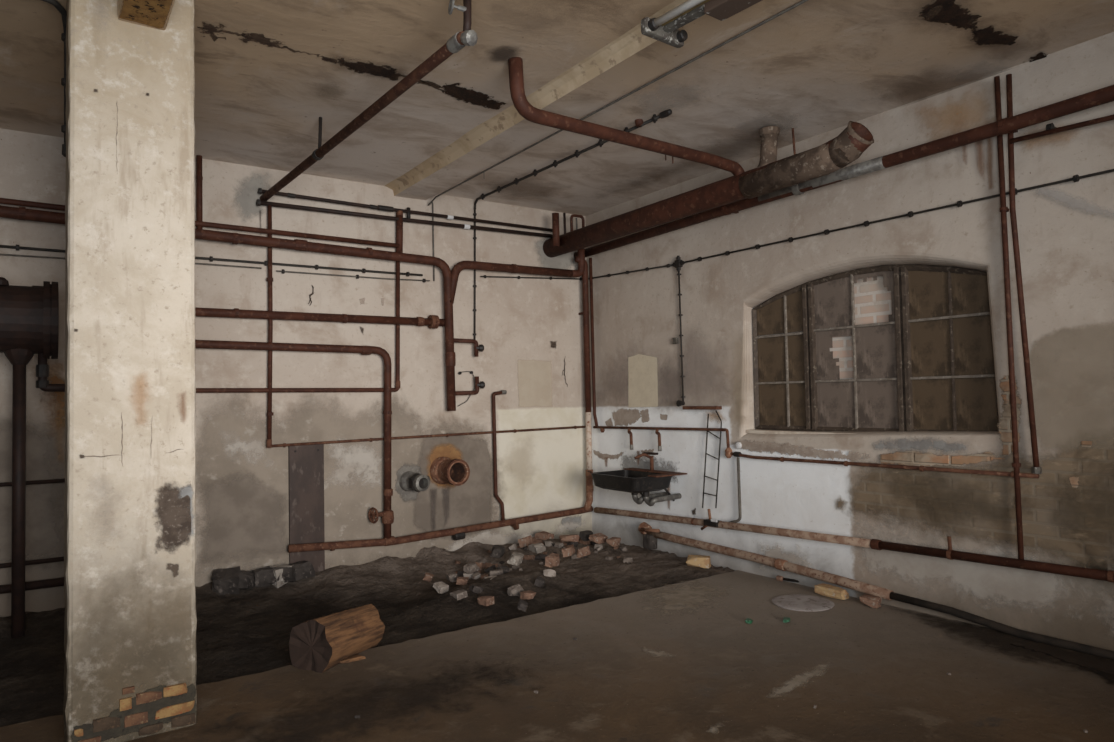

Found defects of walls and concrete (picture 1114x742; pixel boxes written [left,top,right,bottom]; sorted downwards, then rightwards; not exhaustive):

crack [197,21,445,88]
spalling [919,0,1019,45]
water stain [1031,326,1114,448]
peeling [155,484,194,577]
water stain [196,399,498,572]
flaking render [736,376,1114,568]
flaking render [71,682,197,742]